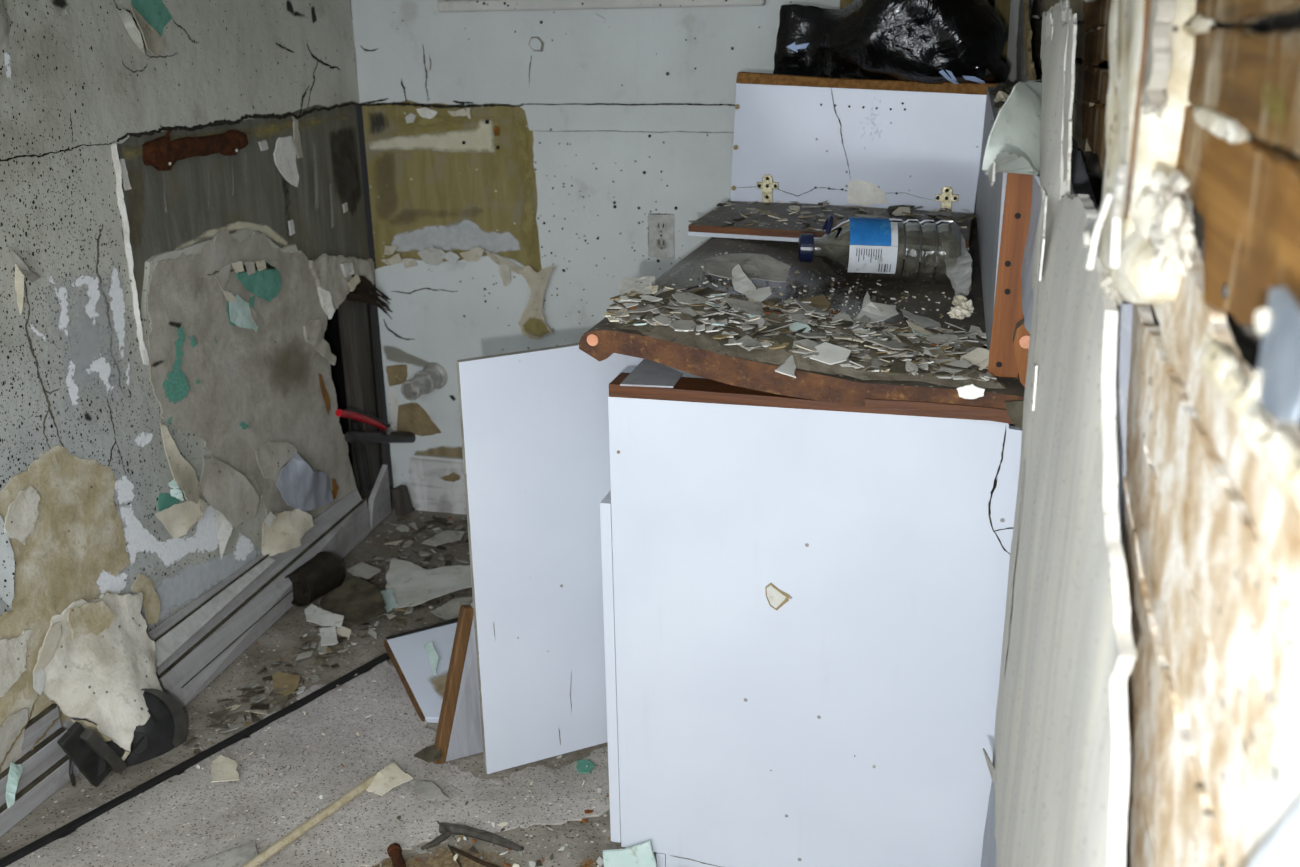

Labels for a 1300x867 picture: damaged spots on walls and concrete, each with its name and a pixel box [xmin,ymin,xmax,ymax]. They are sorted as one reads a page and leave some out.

crack [0,43,532,161]
peeling [416,107,471,119]
peeling [7,246,41,315]
flaking render [111,144,554,560]
flaking render [0,446,164,808]
peeling [319,627,338,646]